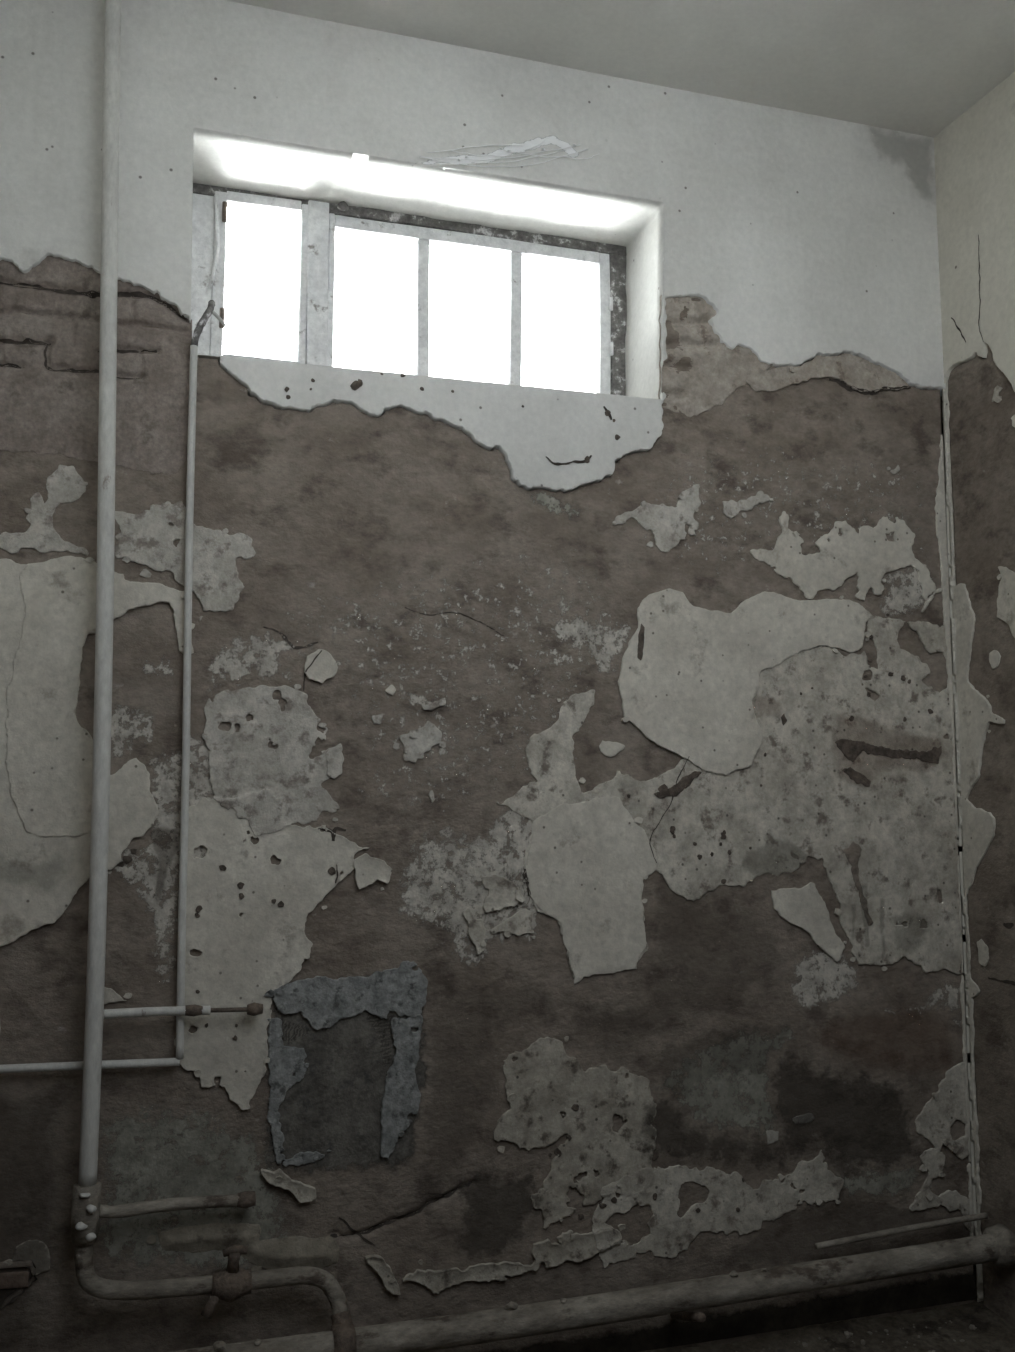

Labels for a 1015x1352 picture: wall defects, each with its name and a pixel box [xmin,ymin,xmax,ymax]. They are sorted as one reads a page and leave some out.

spalling [0,256,100,564]
spalling [75,633,96,739]
spalling [93,280,1015,1327]
spalling [0,878,332,1352]
crack [330,1182,472,1246]
spalling [427,1262,1015,1352]